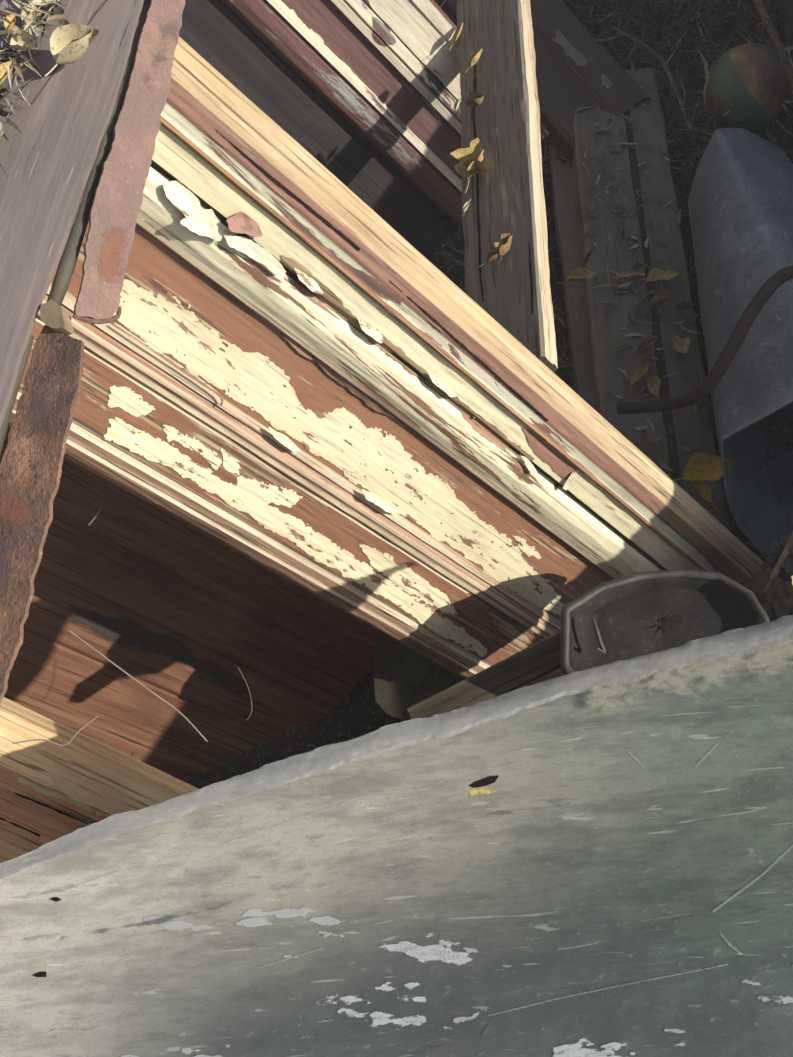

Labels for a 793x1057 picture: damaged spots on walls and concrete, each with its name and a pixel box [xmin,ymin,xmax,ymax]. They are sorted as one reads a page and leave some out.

peeling [361,0,396,47]
peeling [552,29,587,67]
peeling [163,180,263,241]
peeling [104,255,576,657]